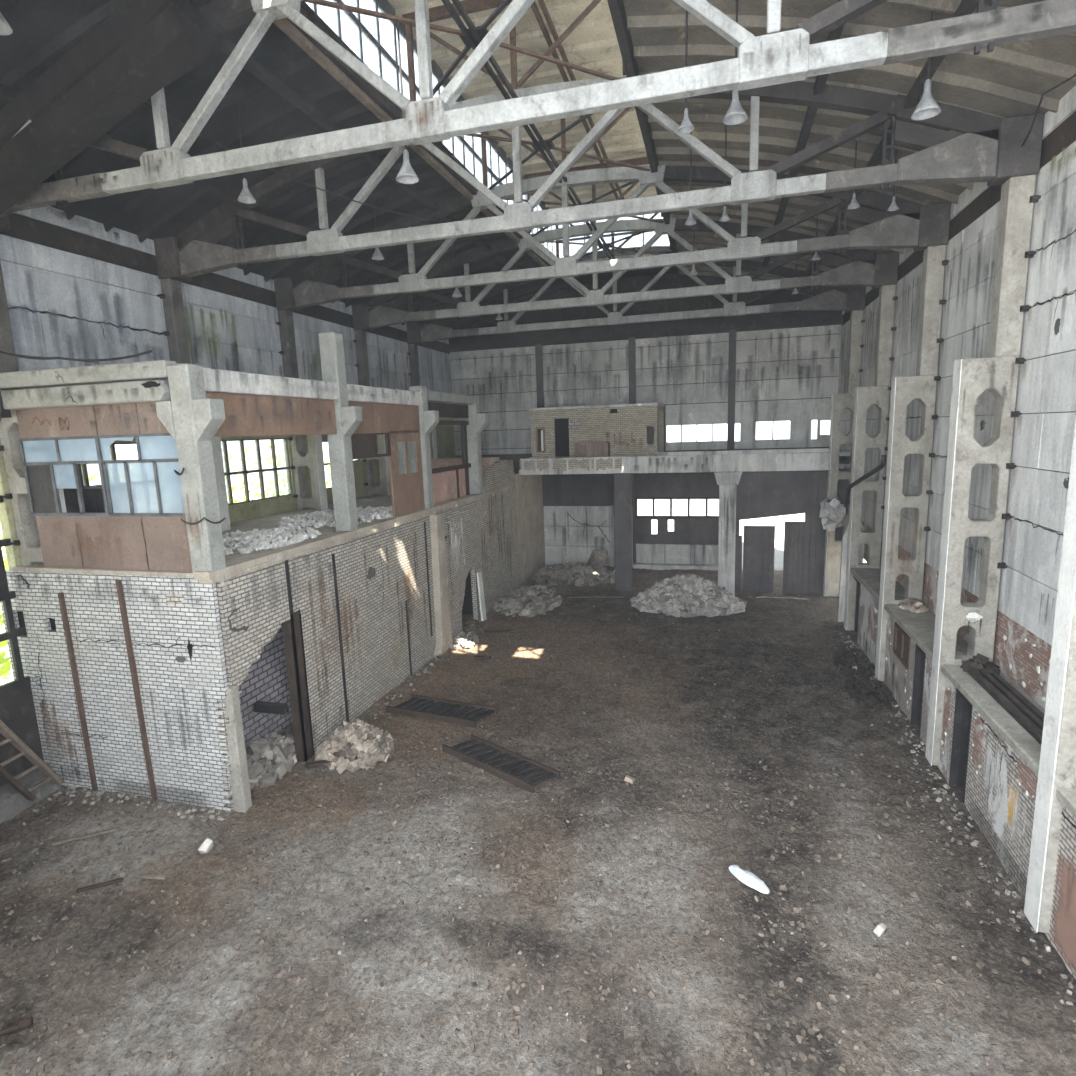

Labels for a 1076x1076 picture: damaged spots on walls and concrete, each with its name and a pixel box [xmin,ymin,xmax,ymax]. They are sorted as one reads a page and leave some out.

peeling [1001,633,1050,702]
peeling [1015,762,1038,801]